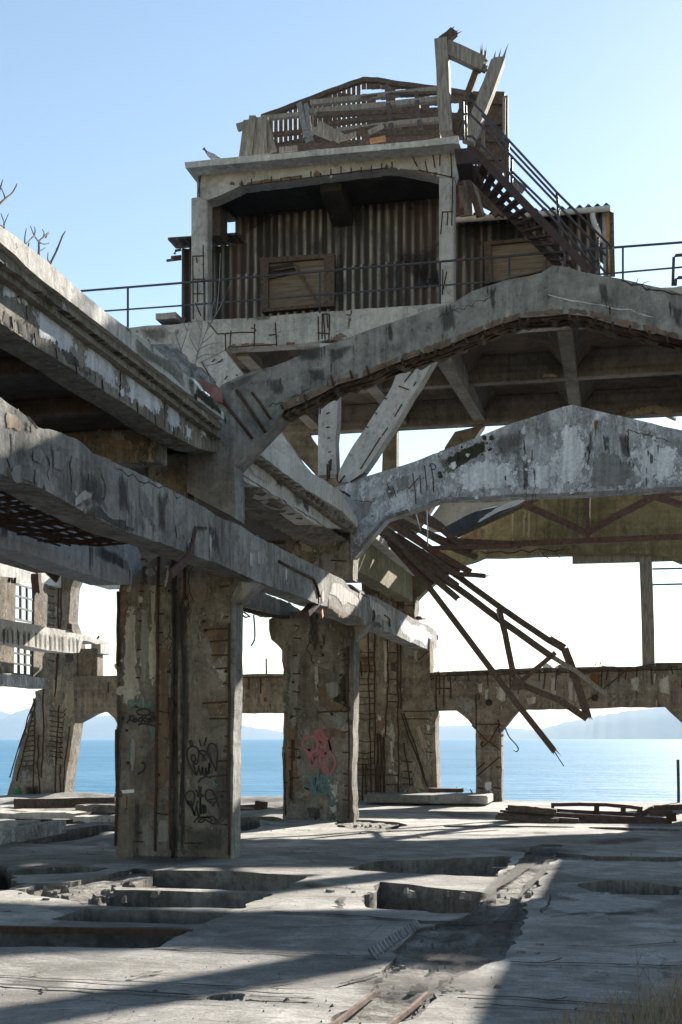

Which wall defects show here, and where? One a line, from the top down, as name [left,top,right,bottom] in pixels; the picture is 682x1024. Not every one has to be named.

spalling [2,245,682,856]